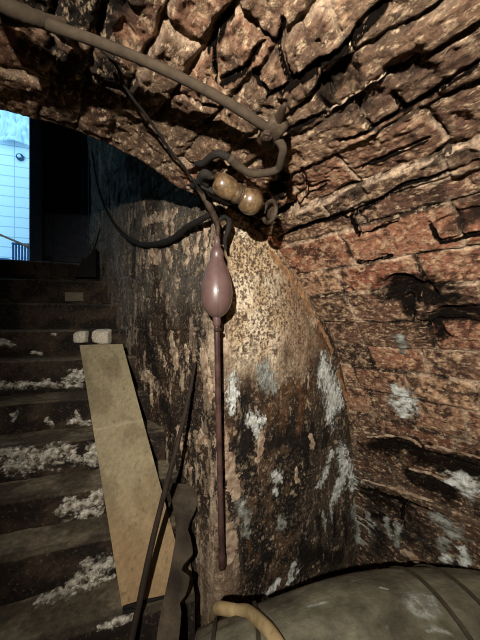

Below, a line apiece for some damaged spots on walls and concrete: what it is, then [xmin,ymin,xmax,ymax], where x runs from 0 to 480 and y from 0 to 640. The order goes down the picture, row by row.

water stain [225,370,267,461]
water stain [256,357,280,395]
water stain [260,350,472,602]
water stain [442,470,480,499]